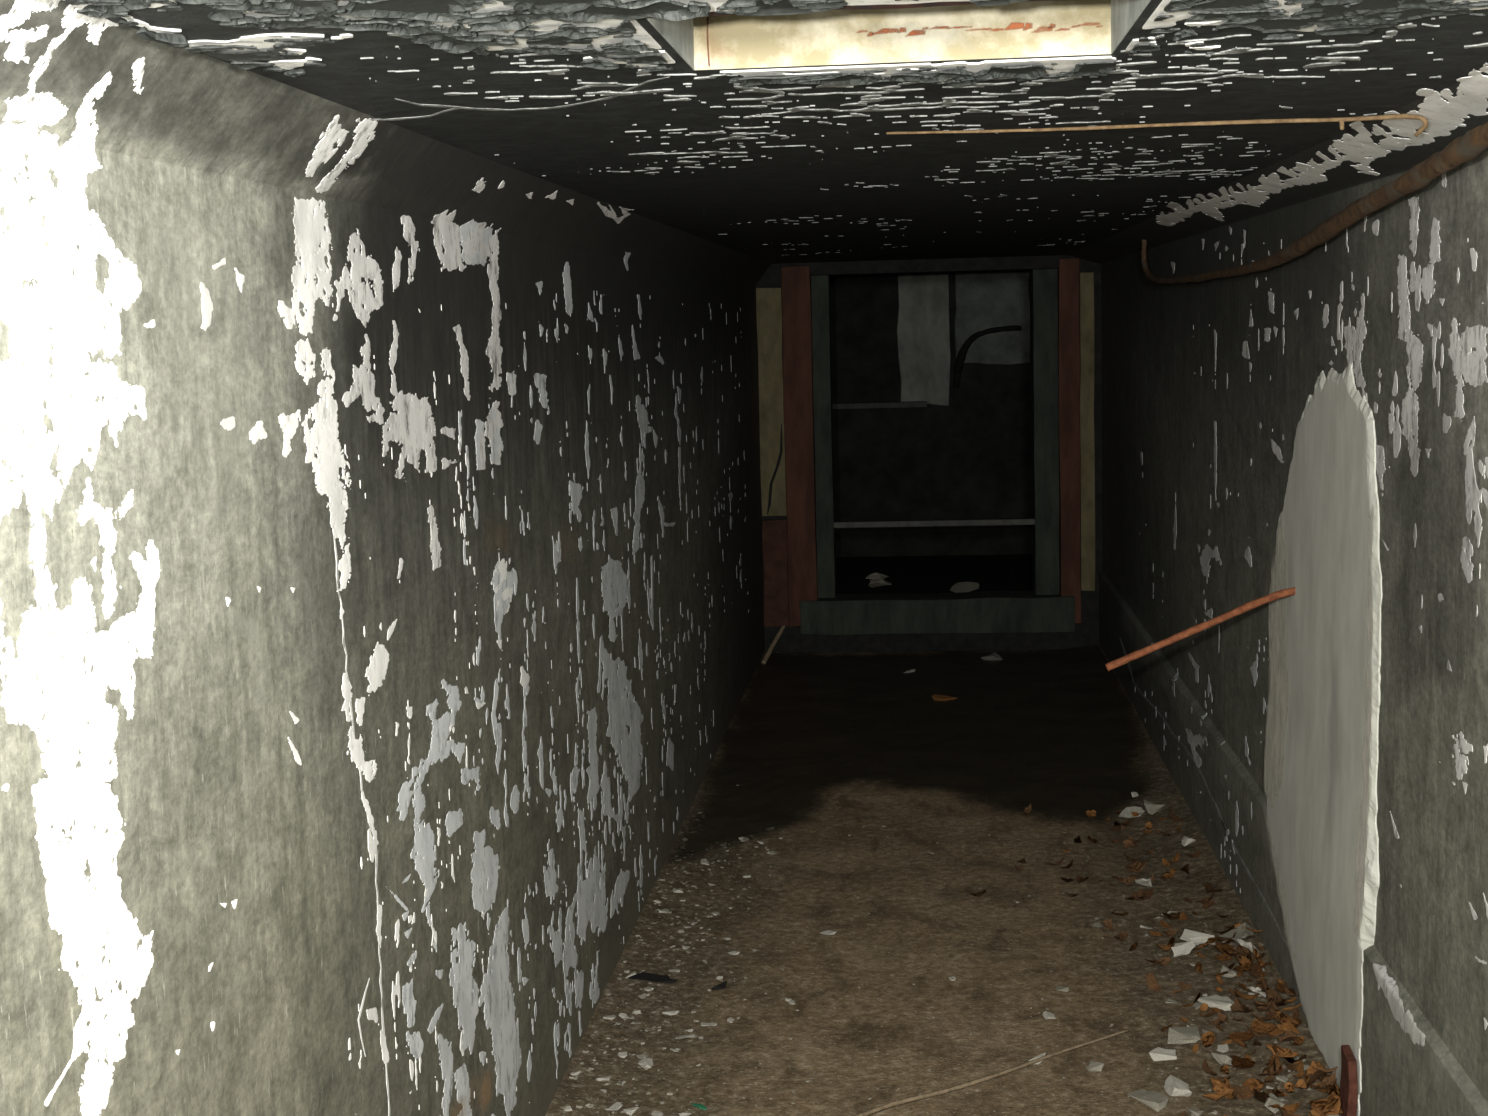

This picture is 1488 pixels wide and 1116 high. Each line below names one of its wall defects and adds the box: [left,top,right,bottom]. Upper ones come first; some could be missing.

peeling [132,57,145,95]
peeling [718,215,912,248]
peeling [200,258,245,331]
peeling [1242,277,1299,380]
peeling [1322,197,1488,583]
peeling [1210,421,1239,509]
peeling [220,115,789,1116]
peeling [1196,529,1222,648]
peeling [1156,653,1225,768]
peeling [1439,731,1488,794]
peeling [1469,893,1488,920]
peeling [1373,964,1426,1046]